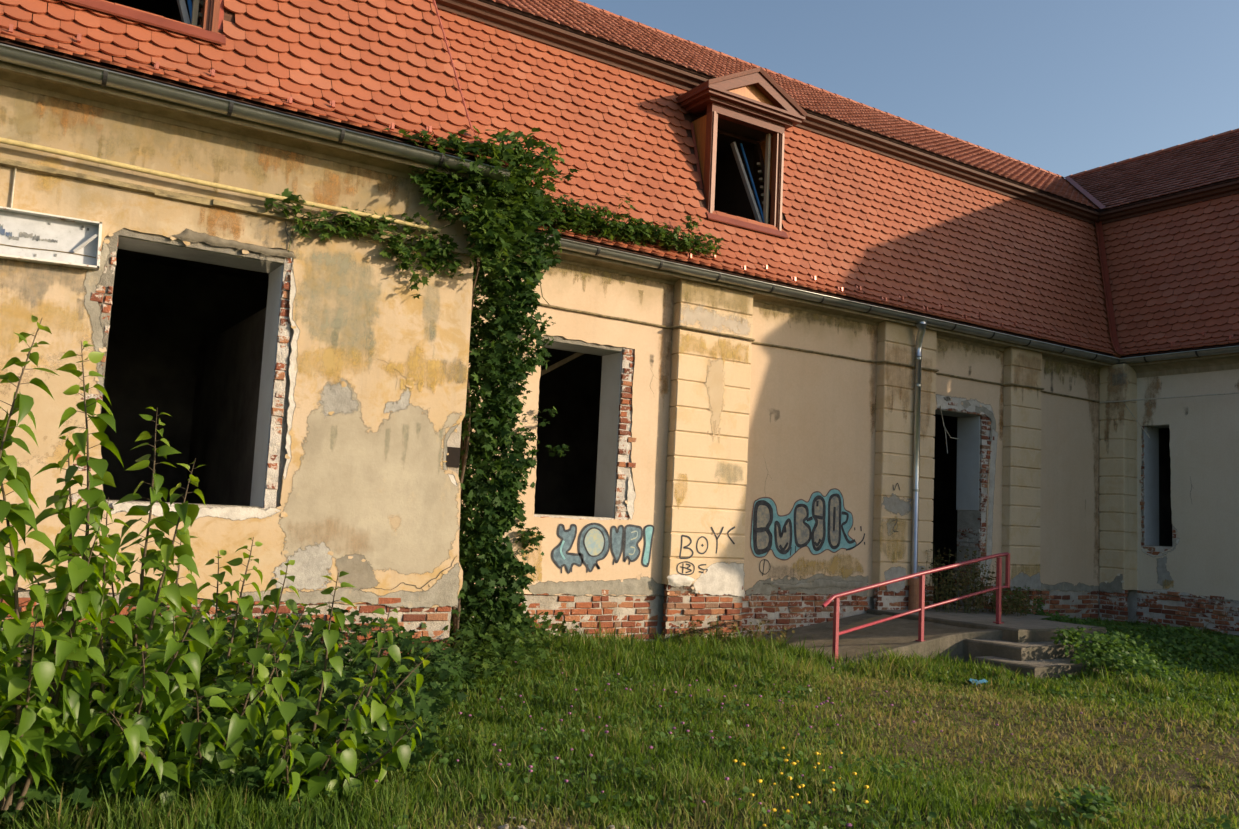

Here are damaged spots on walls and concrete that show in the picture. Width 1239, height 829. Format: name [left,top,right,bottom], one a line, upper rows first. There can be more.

peeling [0,228,463,608]
flaking render [534,335,636,520]
flaking render [527,556,868,597]
flaking render [884,565,926,593]
flaking render [935,394,998,589]
peeling [1139,426,1239,603]